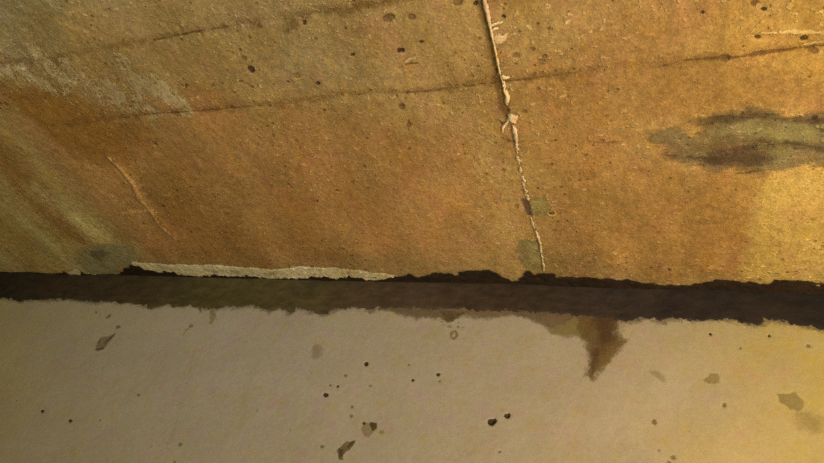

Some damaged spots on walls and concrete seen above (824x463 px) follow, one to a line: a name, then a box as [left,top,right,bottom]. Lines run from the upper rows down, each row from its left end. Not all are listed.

crack [684,44,824,61]
crack [466,0,563,271]
water stain [501,64,824,283]
water stain [441,311,464,340]
water stain [548,315,626,380]